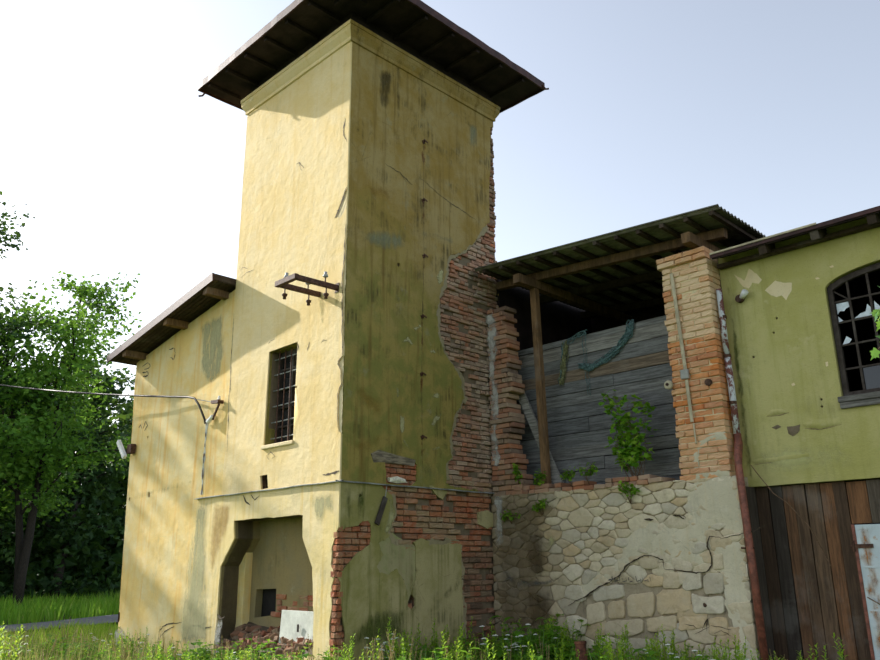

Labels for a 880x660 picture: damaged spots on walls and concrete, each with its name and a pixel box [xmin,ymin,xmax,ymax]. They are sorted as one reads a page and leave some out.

flaking render [735,269,792,300]
leakage [202,317,222,380]
spalling [329,128,499,658]
spalling [772,425,800,436]
leakage [182,509,205,640]
crack [568,525,765,606]